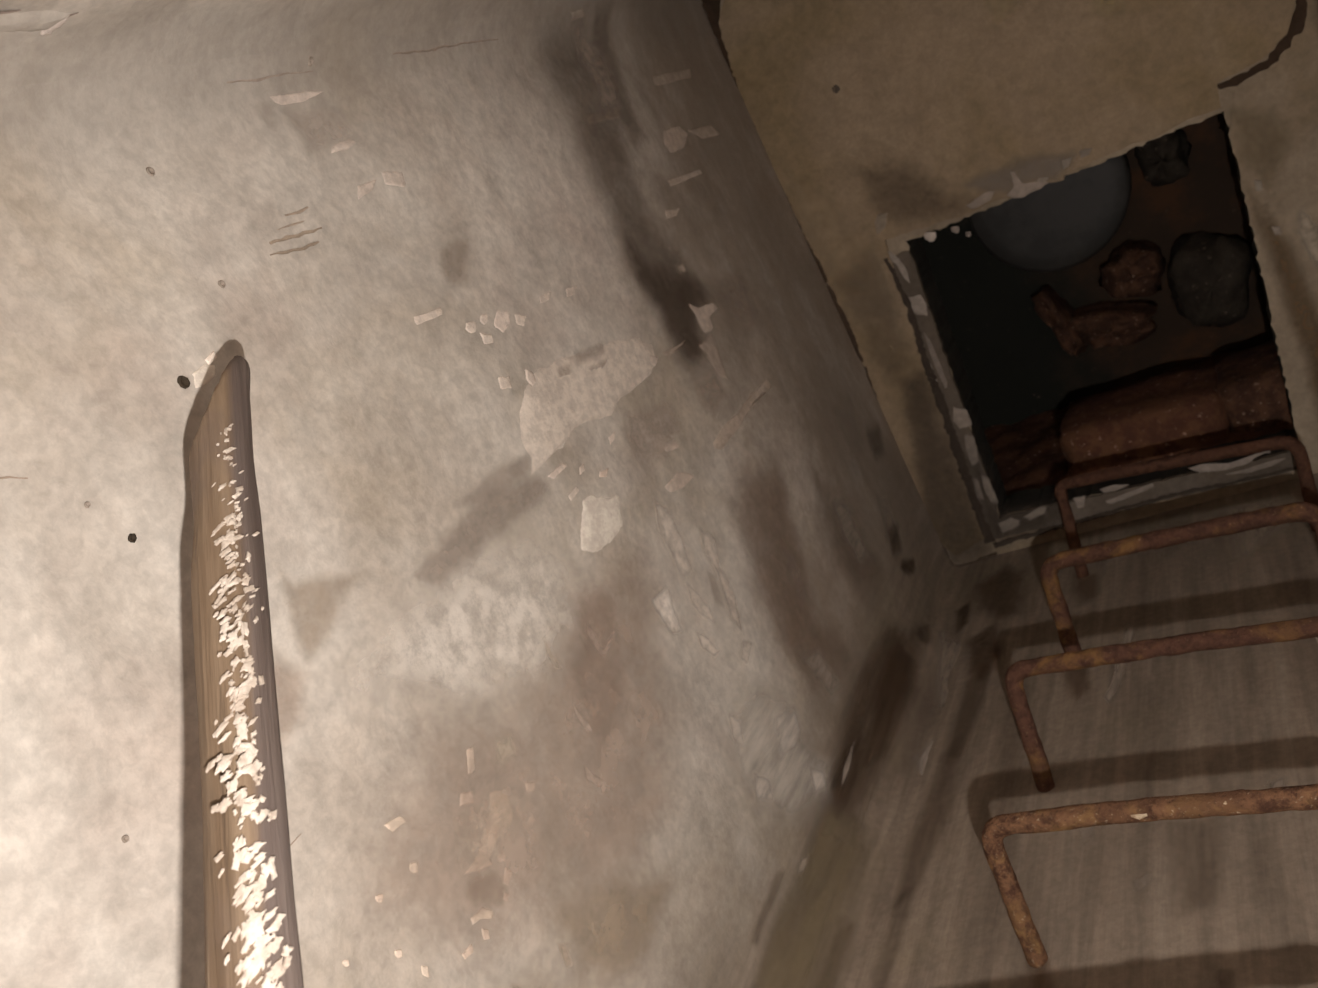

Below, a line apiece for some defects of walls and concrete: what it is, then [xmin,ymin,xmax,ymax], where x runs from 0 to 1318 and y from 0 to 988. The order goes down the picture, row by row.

peeling [663,125,719,153]
flaking render [498,285,751,553]
peeling [205,423,294,988]
peeling [384,816,407,832]
peeling [466,746,475,774]
peeling [460,789,513,959]